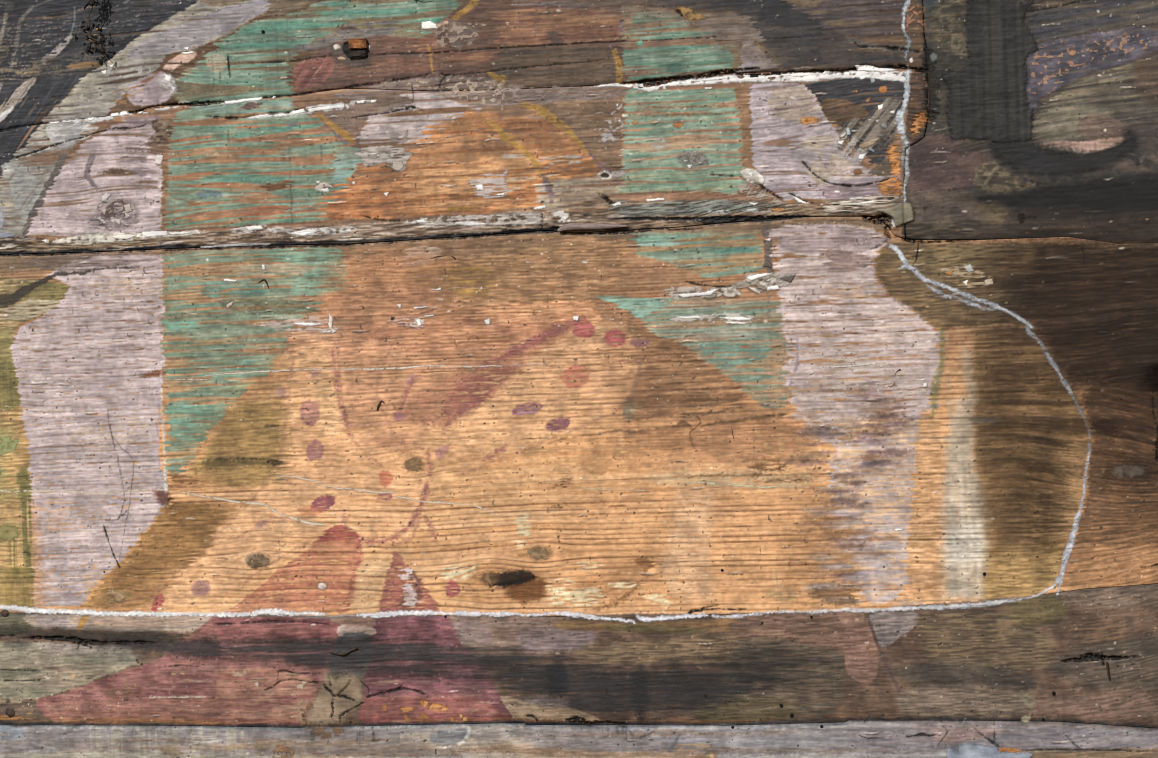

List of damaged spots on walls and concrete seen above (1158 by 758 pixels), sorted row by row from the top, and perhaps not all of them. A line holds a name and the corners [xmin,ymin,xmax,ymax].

spalling [422,21,483,48]
peeling [355,132,412,171]
peeling [385,65,930,215]
peeling [315,181,333,192]
peeling [405,206,571,226]
crack [251,161,976,265]
crack [0,248,223,256]
peeling [665,260,795,300]
peeling [670,313,760,324]
crack [1062,653,1136,666]
crack [265,670,424,717]